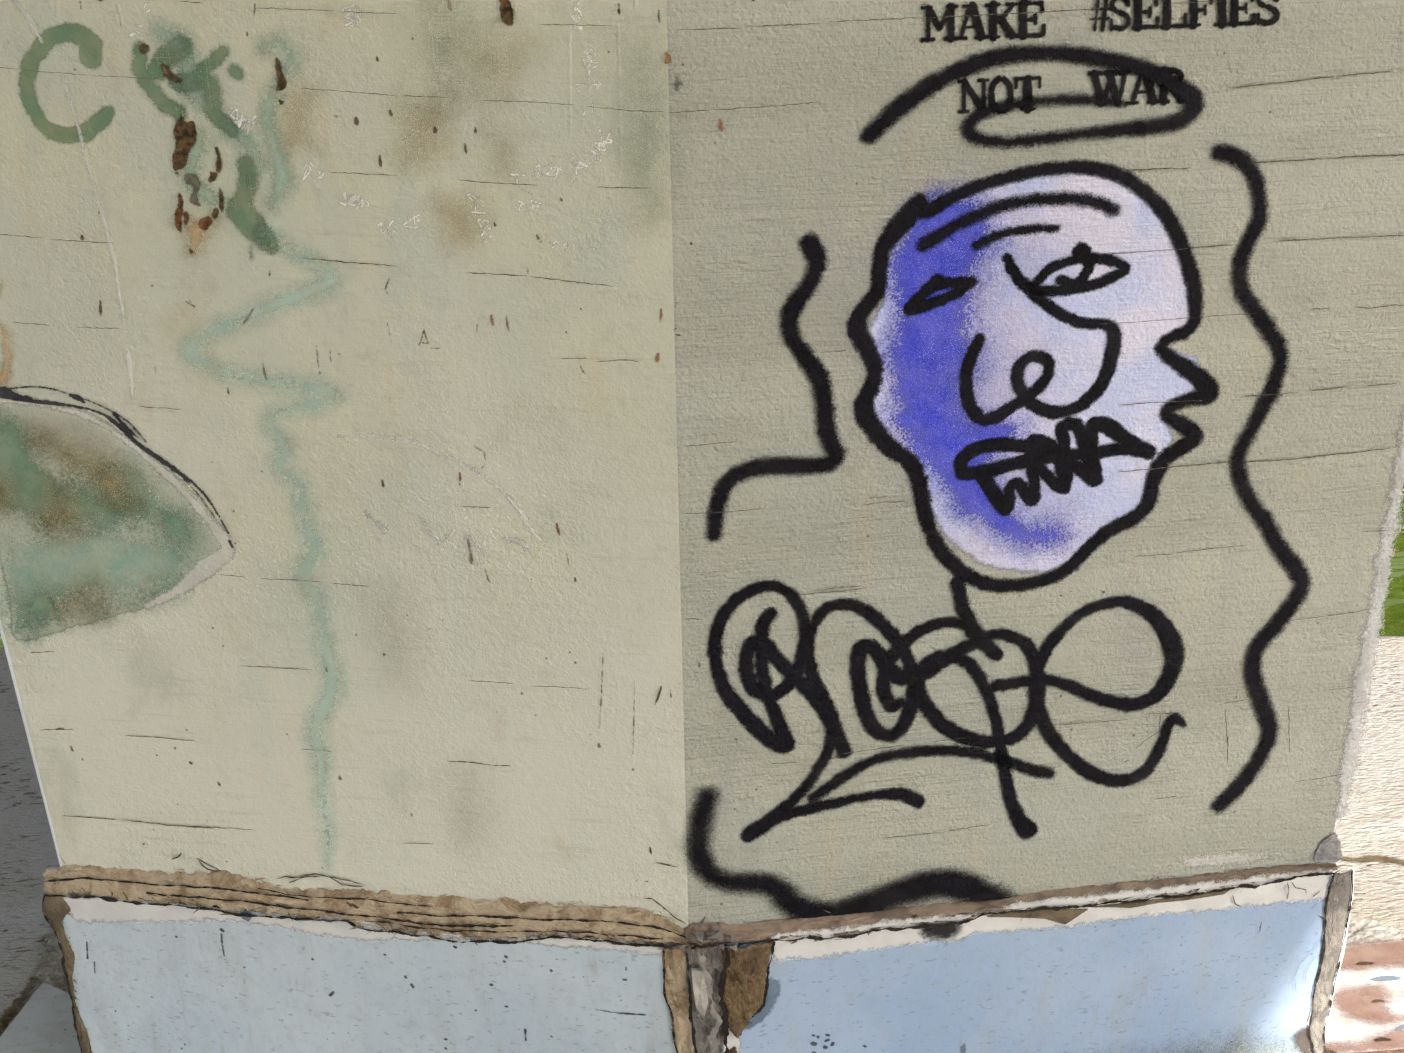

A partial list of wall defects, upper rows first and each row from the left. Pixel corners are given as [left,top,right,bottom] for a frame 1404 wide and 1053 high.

peeling [987,890,1229,924]
peeling [691,968,708,1016]